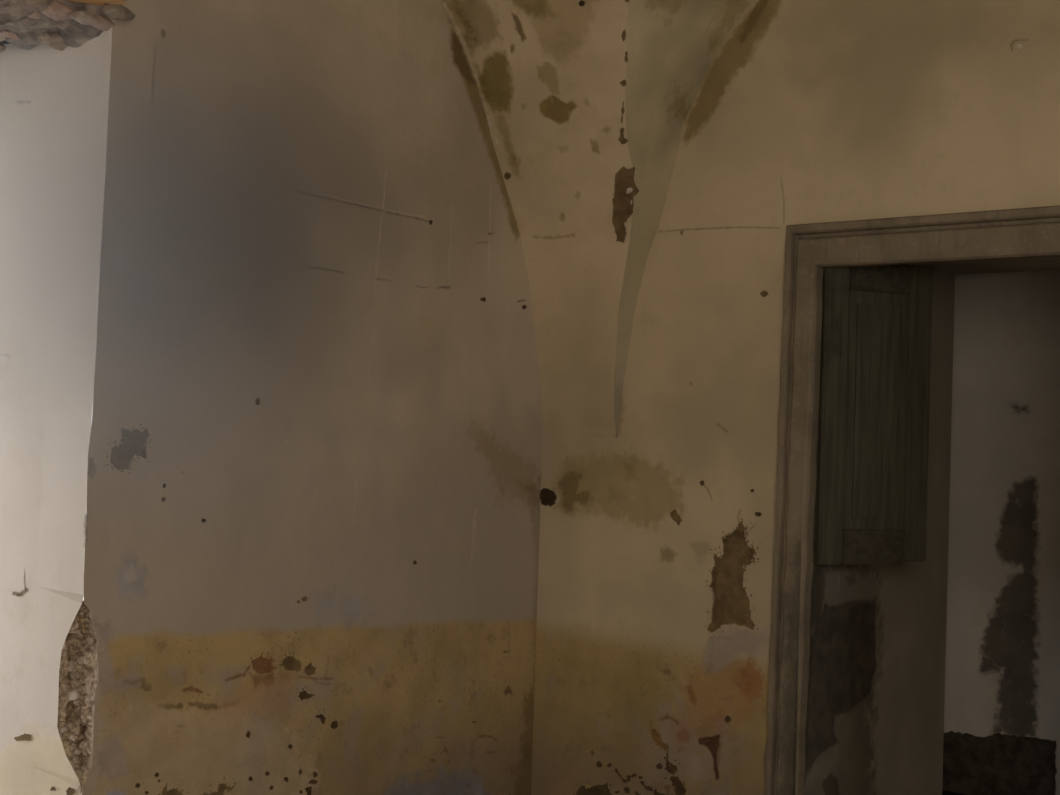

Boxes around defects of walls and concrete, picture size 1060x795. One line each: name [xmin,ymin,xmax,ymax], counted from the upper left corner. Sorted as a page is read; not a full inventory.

spalling [0,0,135,52]
water stain [540,96,576,123]
peeling [612,167,639,242]
peeling [89,420,151,479]
peeling [705,518,762,637]
flaking render [50,601,99,795]
flaking render [135,773,236,795]
peeling [265,769,318,795]
flaking render [573,747,687,795]